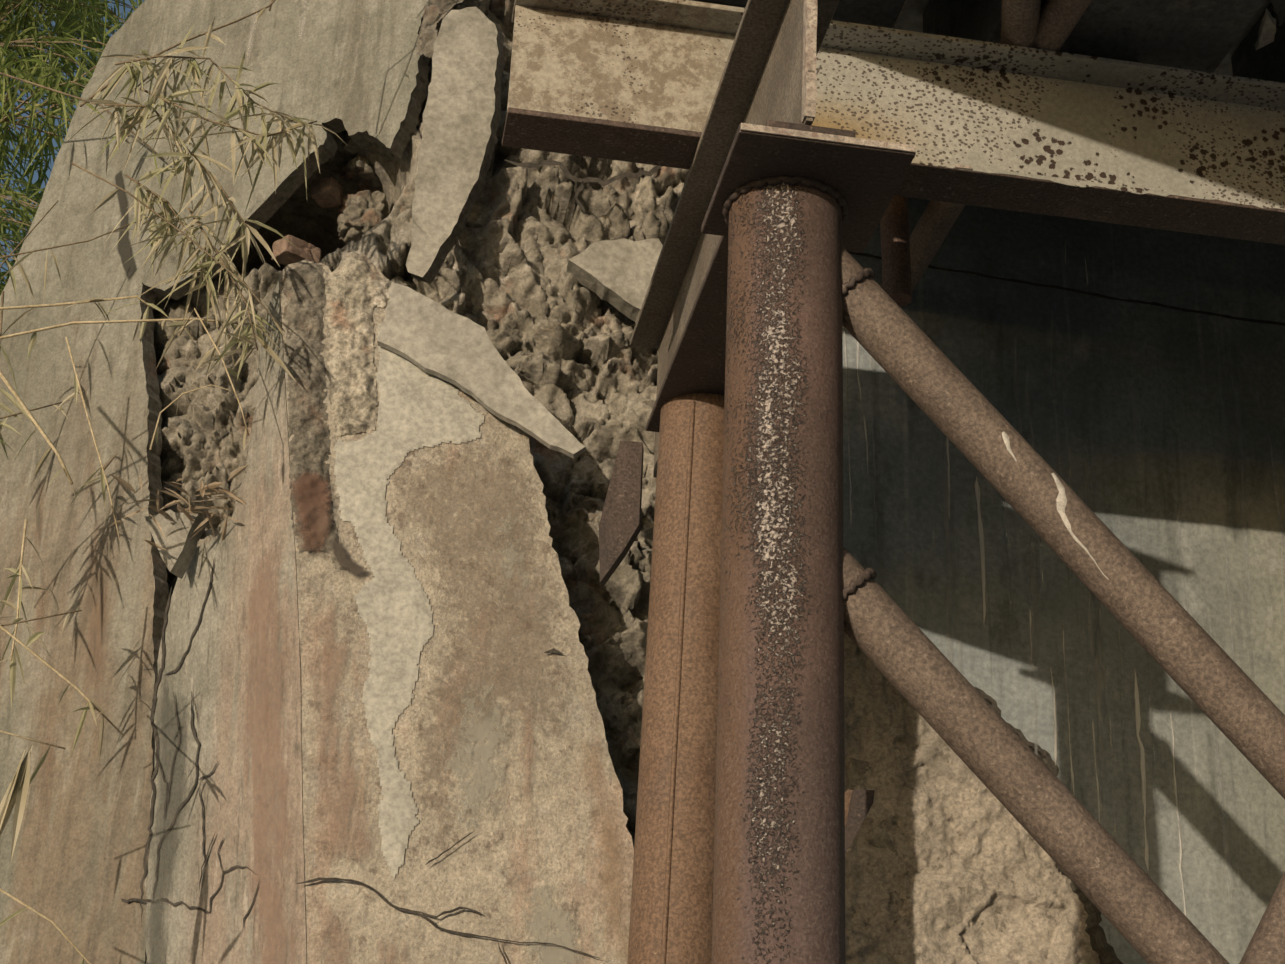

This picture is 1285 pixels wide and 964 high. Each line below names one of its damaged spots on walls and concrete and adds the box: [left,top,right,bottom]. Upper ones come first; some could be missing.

spalling [416,0,463,58]
crack [928,265,1285,326]
flaking render [280,252,484,879]
damp [974,476,986,629]
crack [121,559,260,929]
crack [425,831,474,865]
crack [296,877,604,964]
crack [544,647,563,655]
spalling [844,632,1123,964]
damp [1050,630,1075,796]
damp [1135,671,1149,873]
damp [1172,728,1186,916]